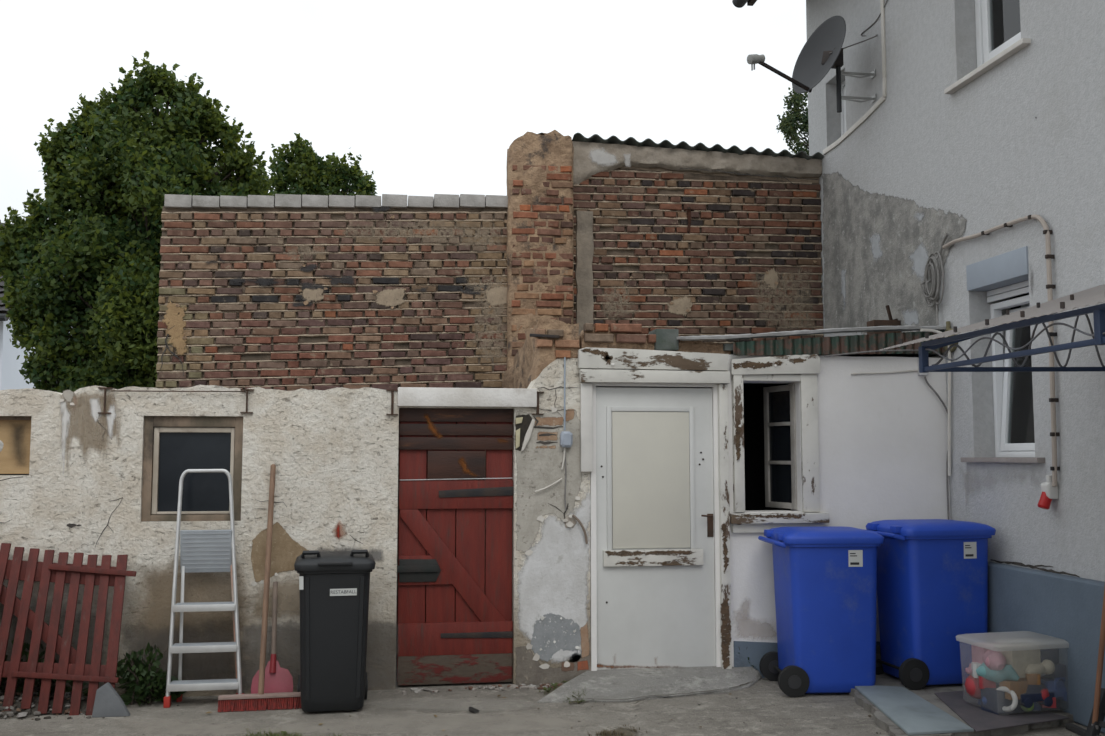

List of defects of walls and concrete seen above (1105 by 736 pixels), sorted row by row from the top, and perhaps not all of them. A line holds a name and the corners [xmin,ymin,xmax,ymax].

peeling [813,172,967,334]
water stain [61,394,116,466]
peeling [515,407,588,556]
peeling [249,522,309,617]
peeling [605,550,696,565]
peeling [721,523,729,573]
flaking render [515,613,591,685]
peeling [720,598,731,669]